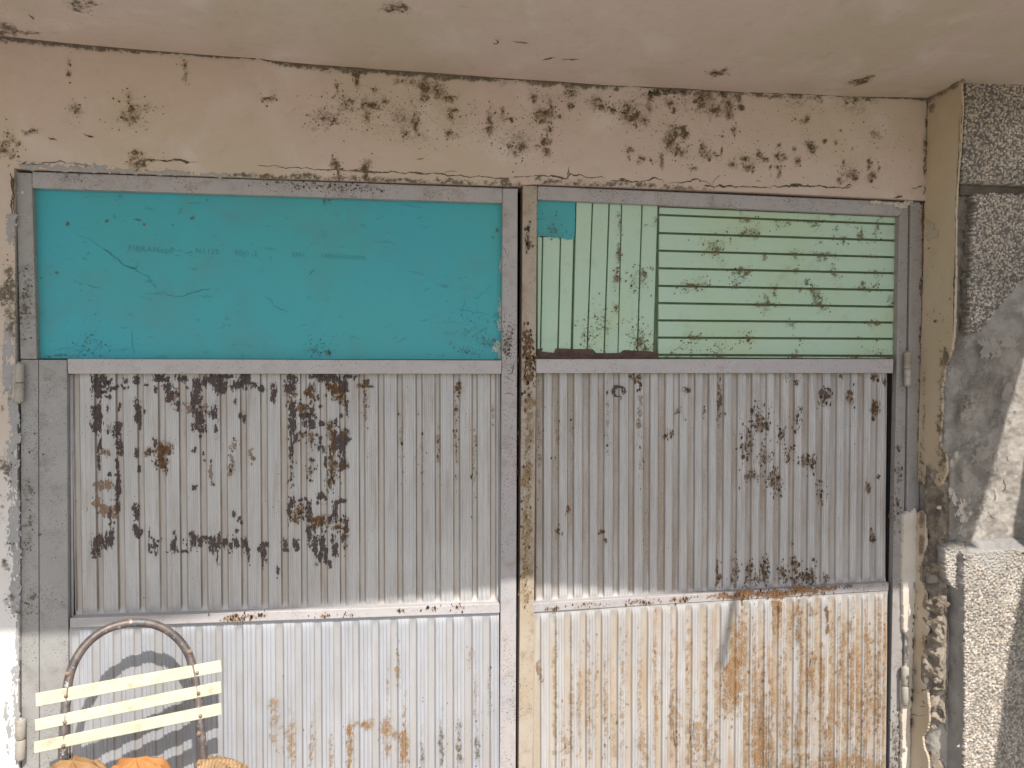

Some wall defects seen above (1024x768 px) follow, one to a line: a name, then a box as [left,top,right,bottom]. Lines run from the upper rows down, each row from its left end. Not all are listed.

leakage [99,88,164,133]
crack [258,158,851,189]
leakage [294,72,965,193]
corrosion [91,479,119,519]
corrosion [144,437,174,474]
corrosion [287,421,350,557]
corrosion [285,378,369,429]
corrosion [516,321,574,616]
corrosion [736,400,828,506]
spalling [910,452,973,732]
corrosion [536,542,900,768]
corrosion [343,708,410,768]